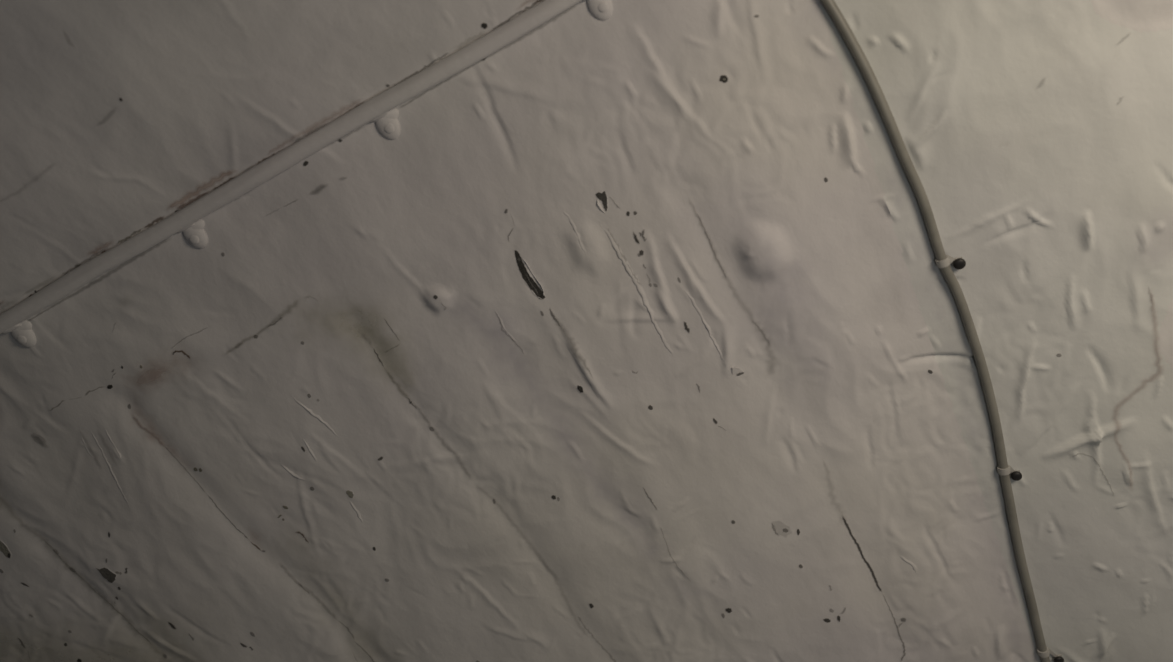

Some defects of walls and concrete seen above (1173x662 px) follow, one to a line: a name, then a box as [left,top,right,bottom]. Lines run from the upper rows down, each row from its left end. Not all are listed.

crack [843,517,881,591]